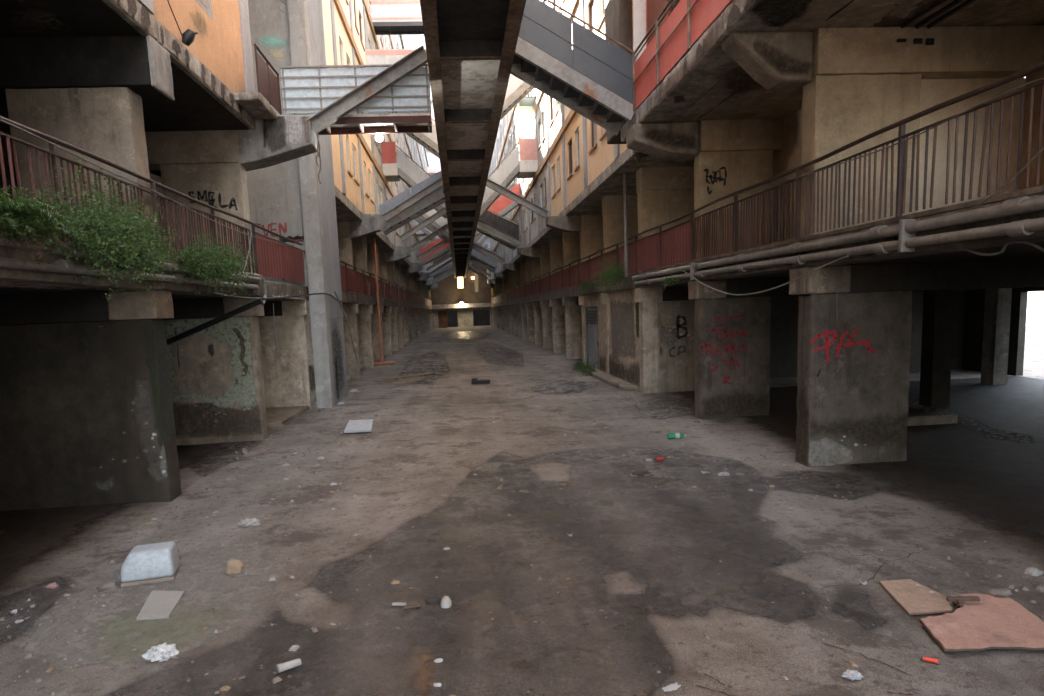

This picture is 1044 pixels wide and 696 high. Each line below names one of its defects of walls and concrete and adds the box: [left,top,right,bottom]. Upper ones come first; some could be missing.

water stain [745,0,811,27]
peeling [99,380,168,482]